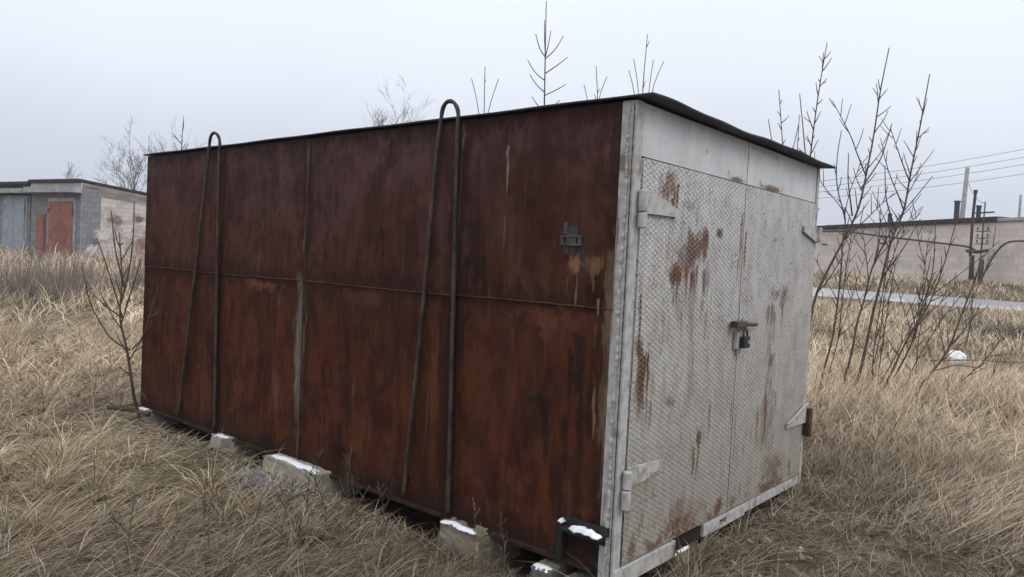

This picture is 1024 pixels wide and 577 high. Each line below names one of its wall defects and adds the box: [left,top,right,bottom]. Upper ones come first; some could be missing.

rust [663,172,680,208]
rust [670,228,723,303]
rust [506,305,597,360]
rust [636,294,652,426]